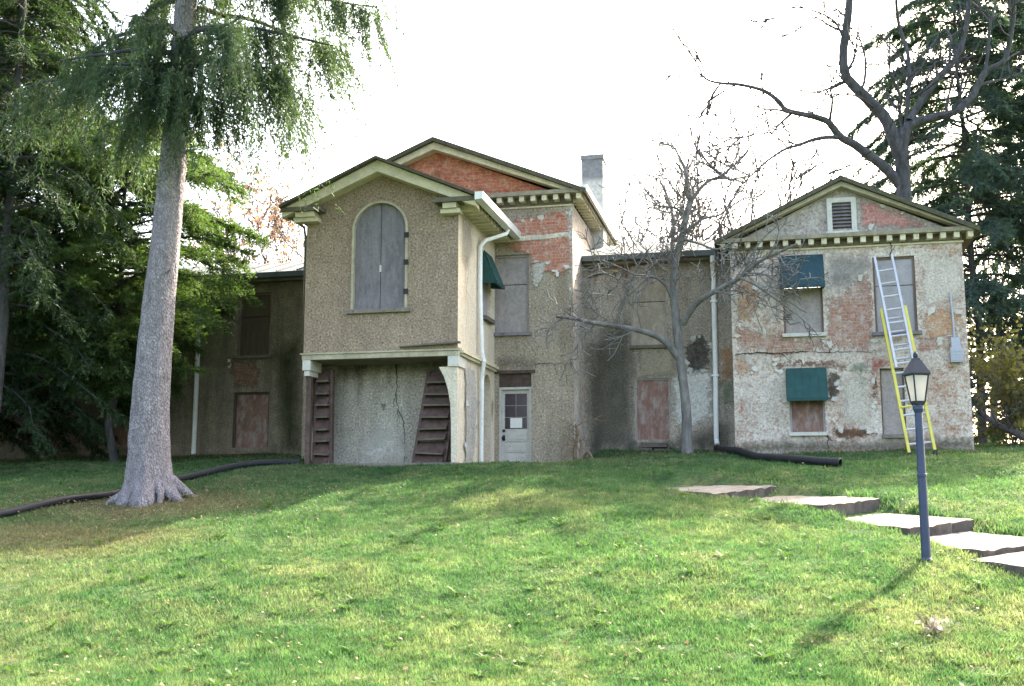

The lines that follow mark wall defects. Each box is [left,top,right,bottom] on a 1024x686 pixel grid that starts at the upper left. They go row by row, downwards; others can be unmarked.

flaking render [508,210,572,289]
crack [393,364,405,461]
peeling [672,335,713,425]
flaking render [732,271,878,401]
flaking render [916,307,963,352]